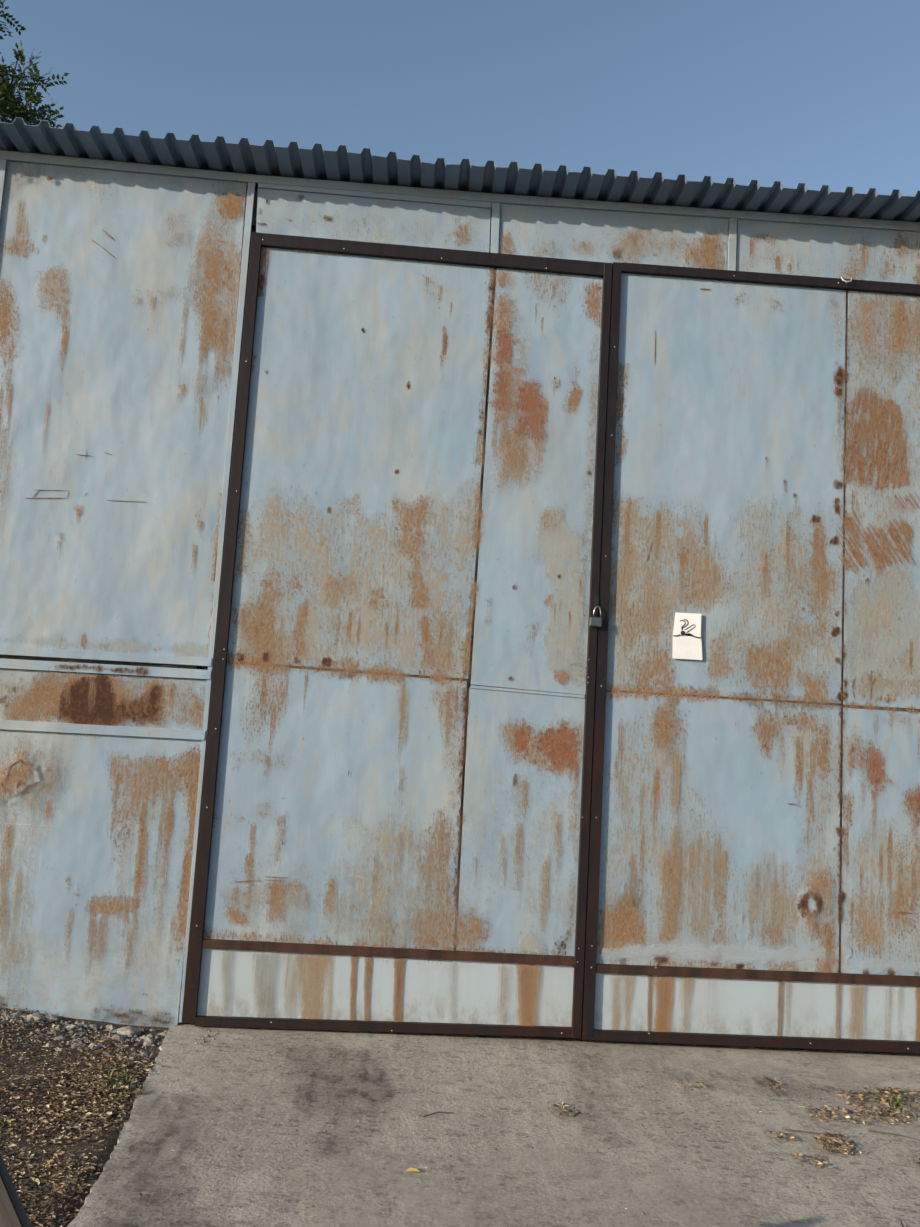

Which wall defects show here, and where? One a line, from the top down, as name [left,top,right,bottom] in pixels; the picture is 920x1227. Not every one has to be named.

corrosion [0,280,19,430]
corrosion [168,188,268,424]
corrosion [475,268,597,487]
corrosion [611,229,725,269]
corrosion [830,234,920,590]
corrosion [0,664,209,730]
corrosion [66,748,201,965]
corrosion [204,882,337,945]
corrosion [226,574,540,1026]
corrosion [502,718,582,850]
corrosion [597,679,920,1039]
corrosion [831,599,846,663]